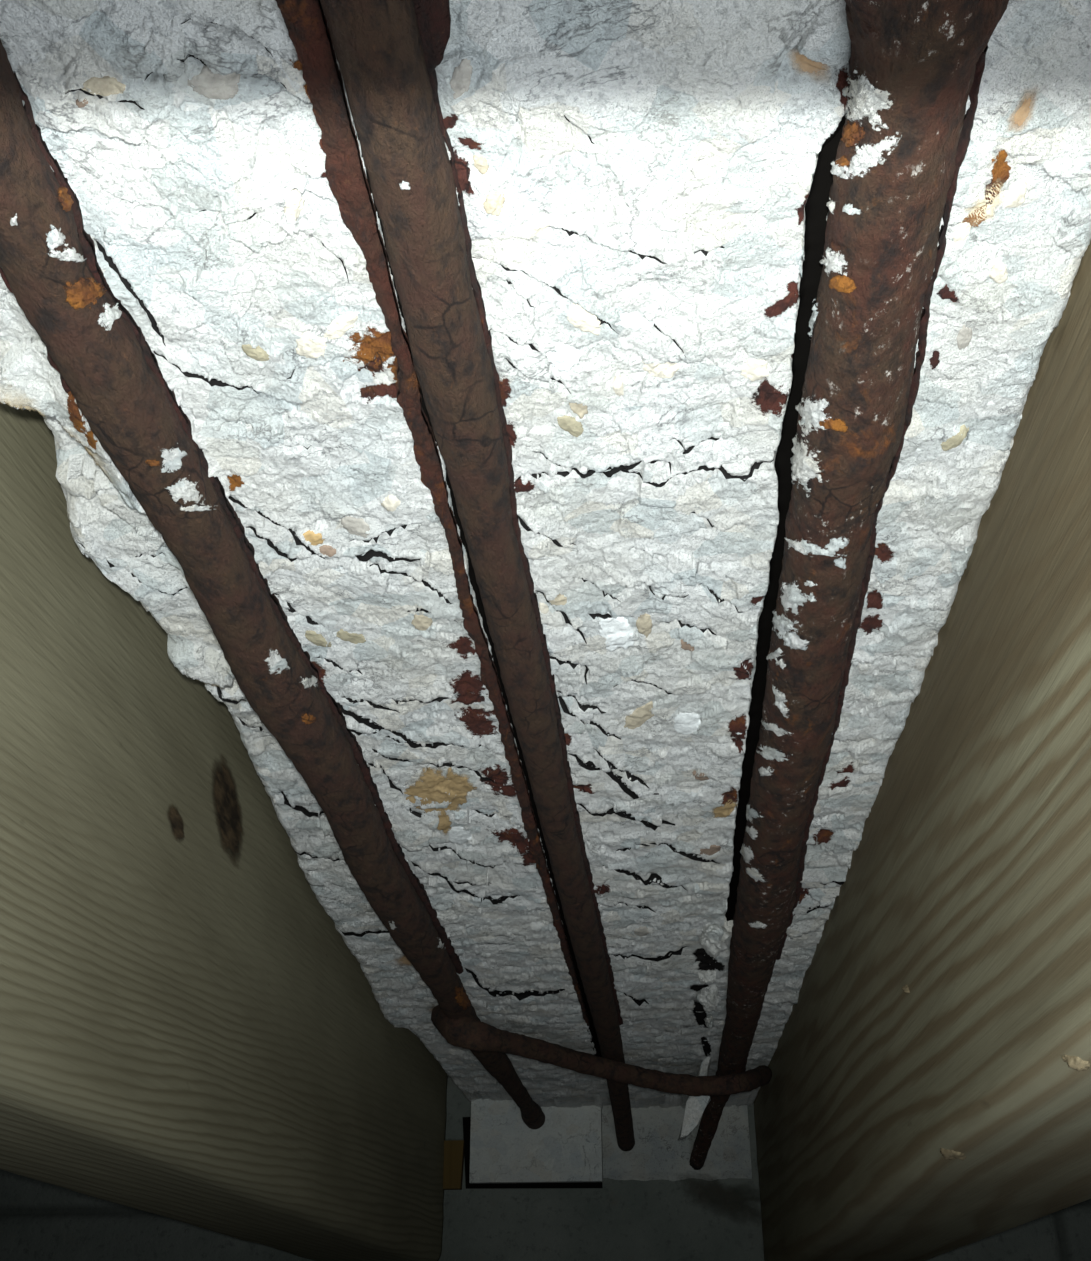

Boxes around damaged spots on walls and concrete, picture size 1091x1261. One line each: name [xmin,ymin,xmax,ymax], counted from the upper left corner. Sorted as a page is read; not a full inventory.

rust [443,114,485,197]
crack [96,241,295,411]
rust [343,326,399,403]
rust [751,377,790,417]
rust [764,282,799,318]
crack [229,496,325,562]
spalling [0,0,689,1151]
crack [514,113,847,921]
spalling [435,0,1091,1076]
crack [275,386,602,1057]
rust [446,636,498,738]
spalling [689,1087,760,1170]